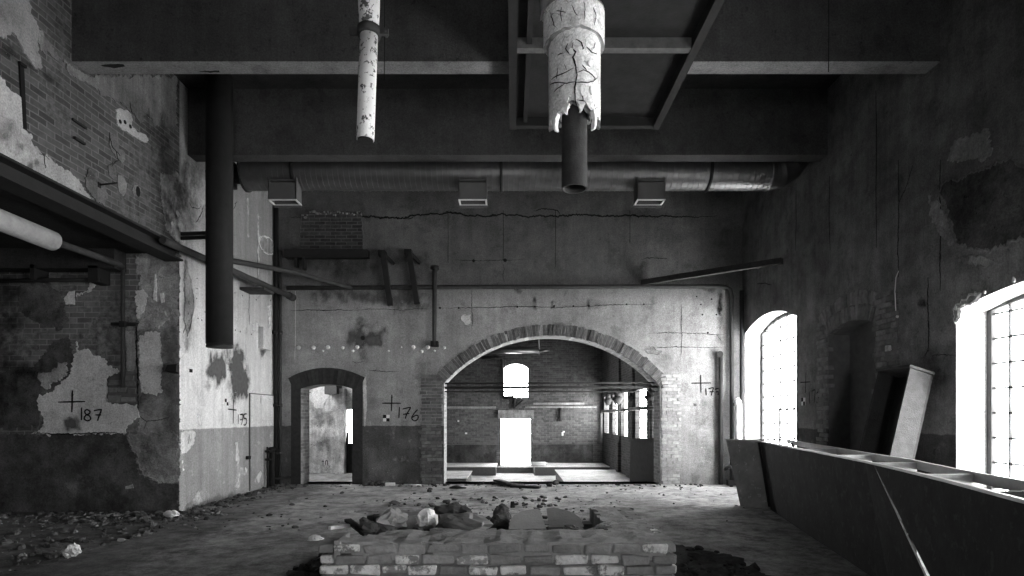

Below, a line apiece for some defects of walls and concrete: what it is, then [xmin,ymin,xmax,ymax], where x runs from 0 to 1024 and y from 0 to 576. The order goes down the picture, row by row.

crack [362,208,715,219]
flaking render [939,156,1024,255]
flaking render [0,282,74,430]
water stain [206,344,249,402]
water stain [347,319,385,349]